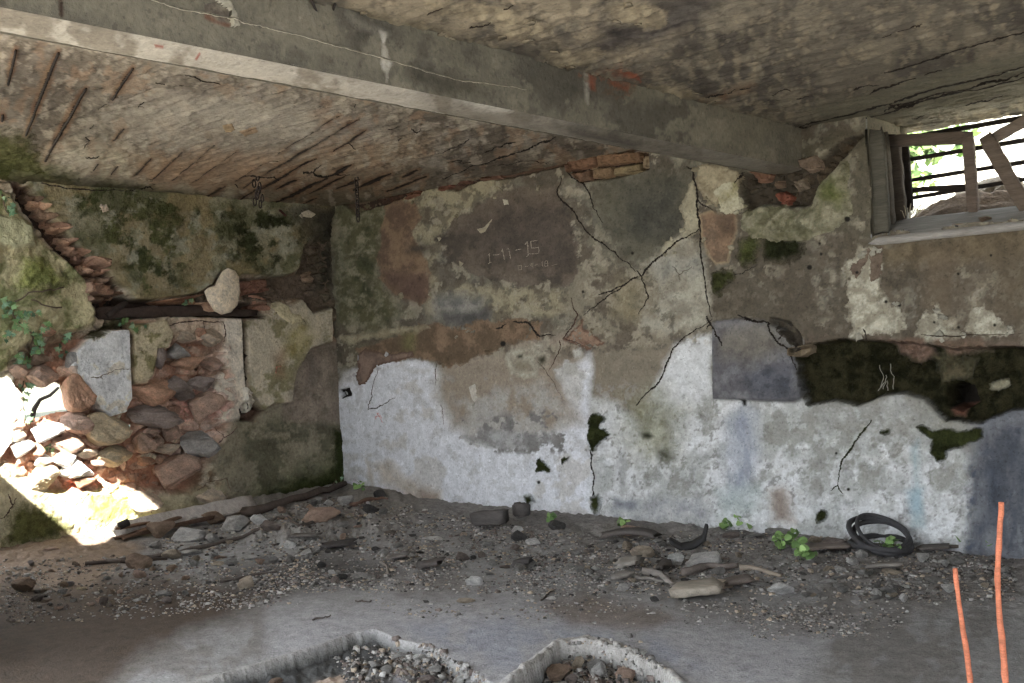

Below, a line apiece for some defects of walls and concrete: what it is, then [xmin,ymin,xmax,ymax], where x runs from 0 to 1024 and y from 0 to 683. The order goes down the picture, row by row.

crack [772,32,1024,129]
flaking render [564,152,650,182]
flaking render [663,135,863,266]
spalling [2,181,323,501]
damp [267,199,497,382]
flaking render [282,317,606,435]
crack [442,137,722,406]
flaking render [776,243,1024,425]
damp [244,446,334,498]
crack [588,450,596,496]
crack [831,420,872,494]
damp [961,417,1024,559]